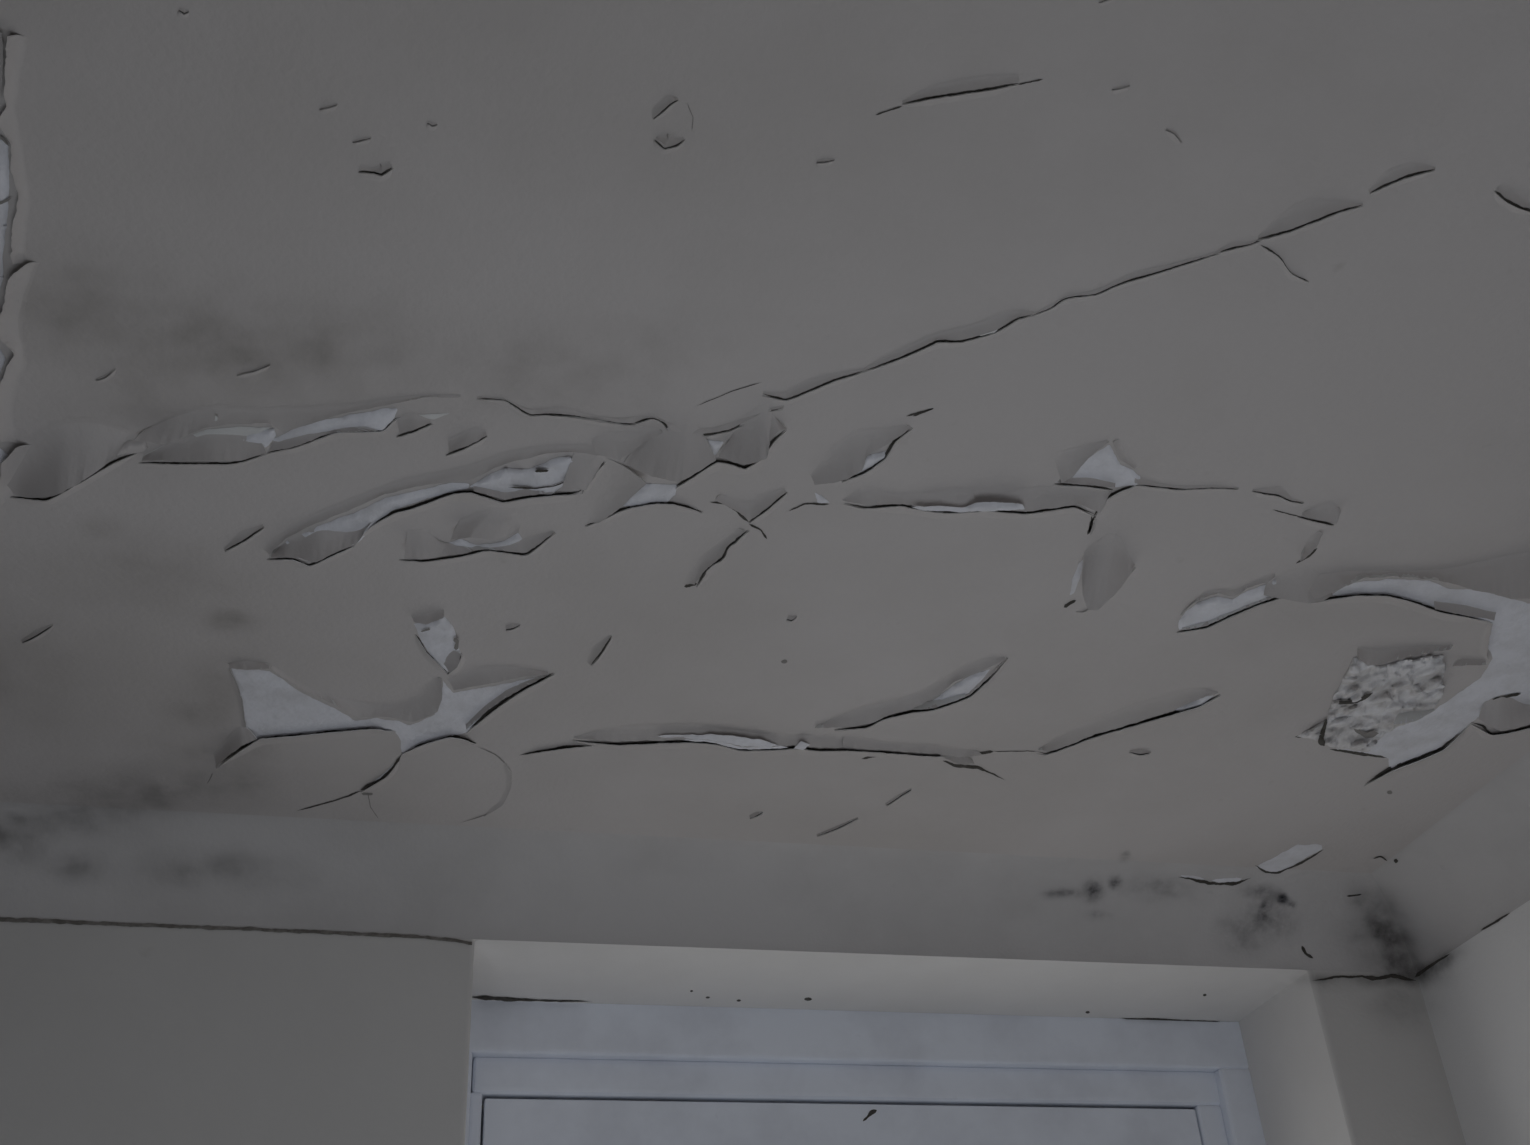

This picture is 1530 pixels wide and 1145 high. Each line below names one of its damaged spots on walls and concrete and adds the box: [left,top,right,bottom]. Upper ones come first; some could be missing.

peeling [0,32,461,507]
crack [700,162,1435,405]
peeling [263,403,787,570]
peeling [790,409,1140,614]
peeling [207,610,554,811]
peeling [586,635,613,666]
peeling [522,657,1220,780]
peeling [1177,531,1530,786]
peeling [1255,844,1322,874]